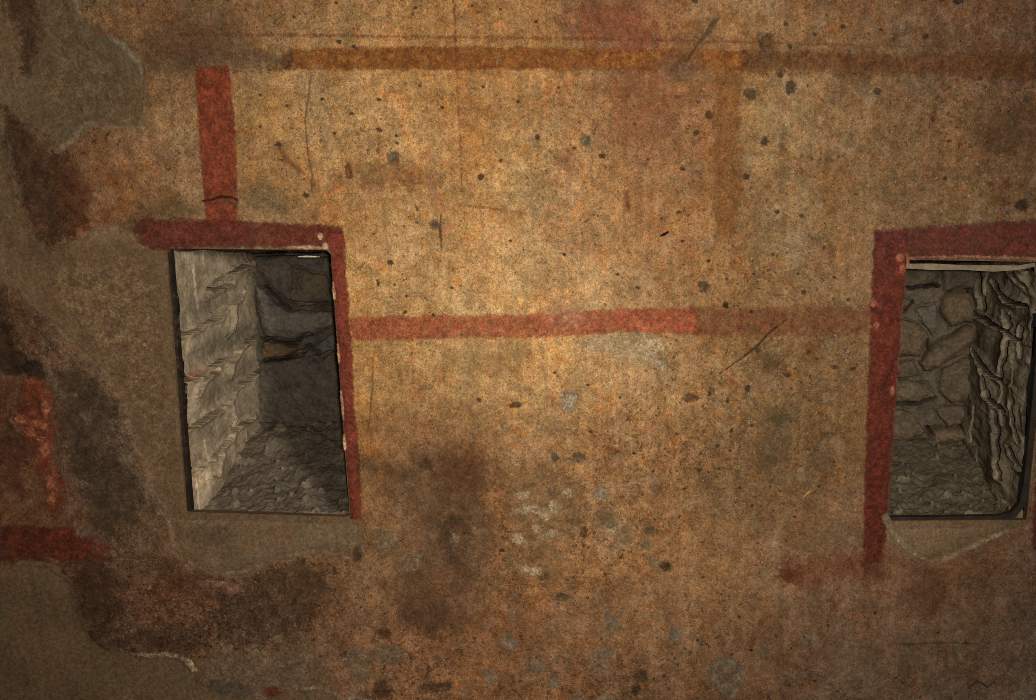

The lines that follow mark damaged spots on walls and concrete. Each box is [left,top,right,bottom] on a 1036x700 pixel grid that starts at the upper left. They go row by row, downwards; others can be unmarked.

leakage [0,0,139,254]
spalling [287,234,328,250]
leakage [25,229,179,538]
spalling [0,287,324,594]
spalling [131,652,197,672]
spalling [296,680,394,700]